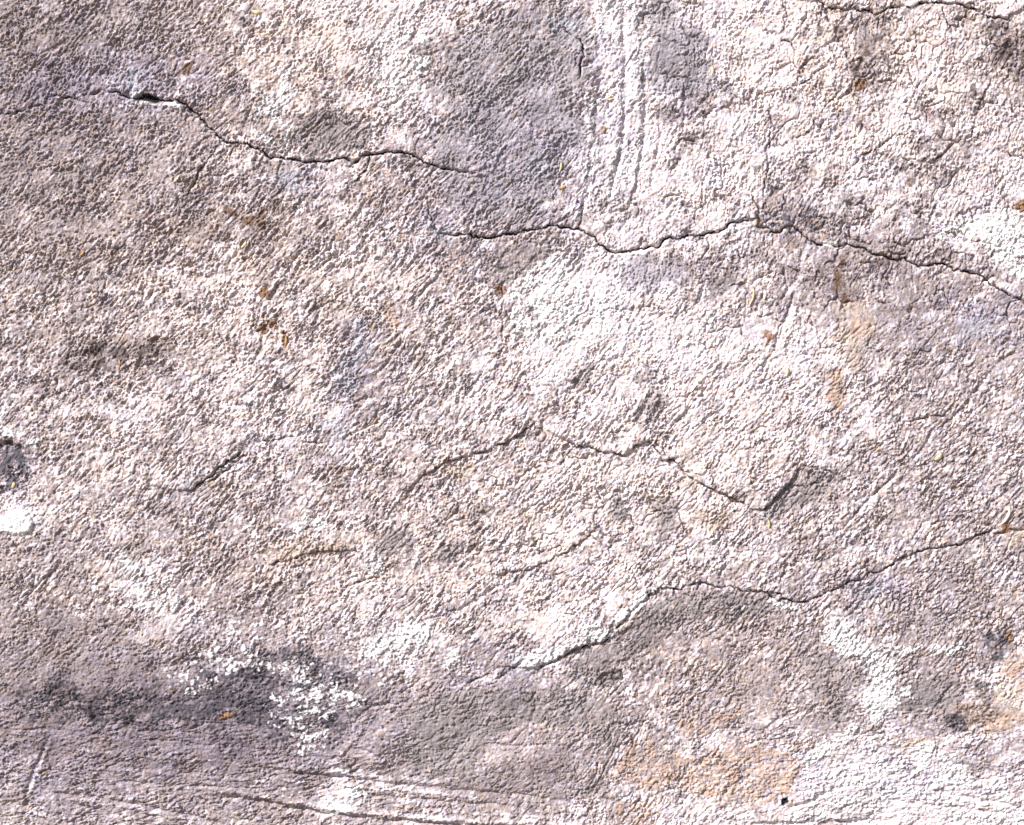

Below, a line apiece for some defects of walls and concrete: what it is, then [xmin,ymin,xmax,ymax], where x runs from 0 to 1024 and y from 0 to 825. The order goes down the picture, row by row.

crack [564,21,585,80]
crack [782,1,1011,46]
crack [889,52,950,135]
crack [3,89,480,195]
crack [427,65,1024,304]
crack [416,423,535,482]
crack [572,428,847,511]
crack [512,536,609,572]
crack [647,529,1023,610]
damp [15,642,369,750]